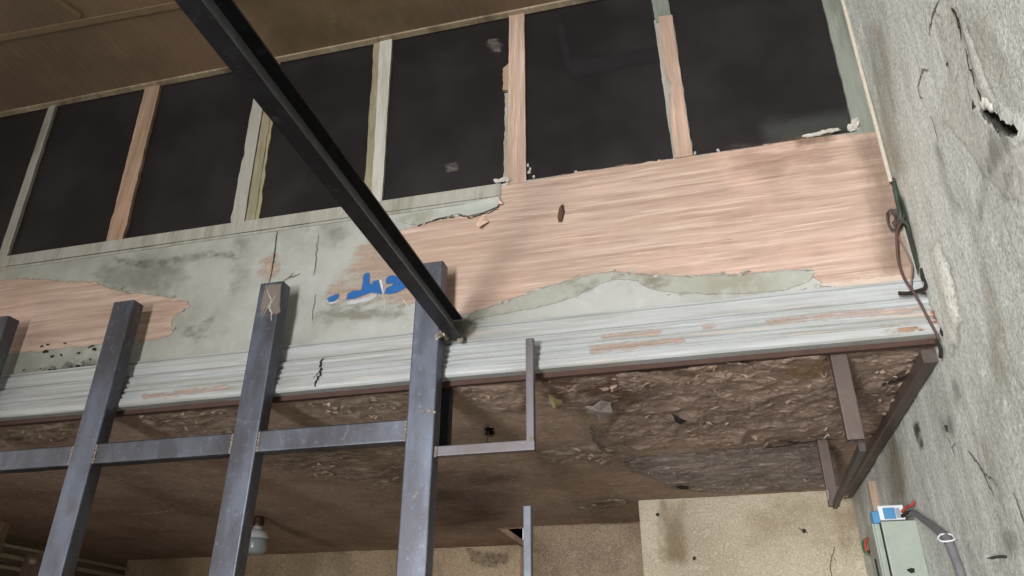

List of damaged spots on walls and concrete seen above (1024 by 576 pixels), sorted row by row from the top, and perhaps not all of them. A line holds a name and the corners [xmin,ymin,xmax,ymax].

crack [929,0,981,101]
peeling [0,266,190,358]
peeling [328,245,396,300]
peeling [389,288,415,304]
peeling [393,132,914,321]
crack [313,358,324,387]